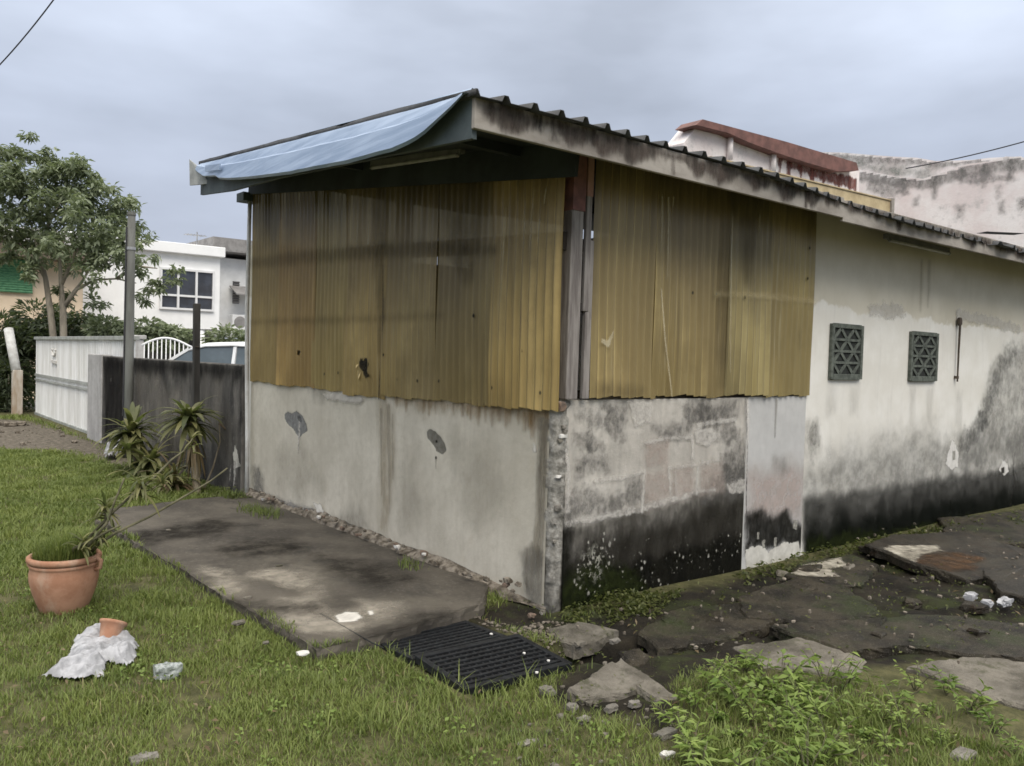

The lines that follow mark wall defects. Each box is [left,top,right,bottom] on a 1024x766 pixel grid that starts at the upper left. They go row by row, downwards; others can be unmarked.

water stain [487,103,883,219]
water stain [896,214,1024,258]
spalling [533,401,661,613]
water stain [561,390,1024,611]
peeling [946,440,959,470]